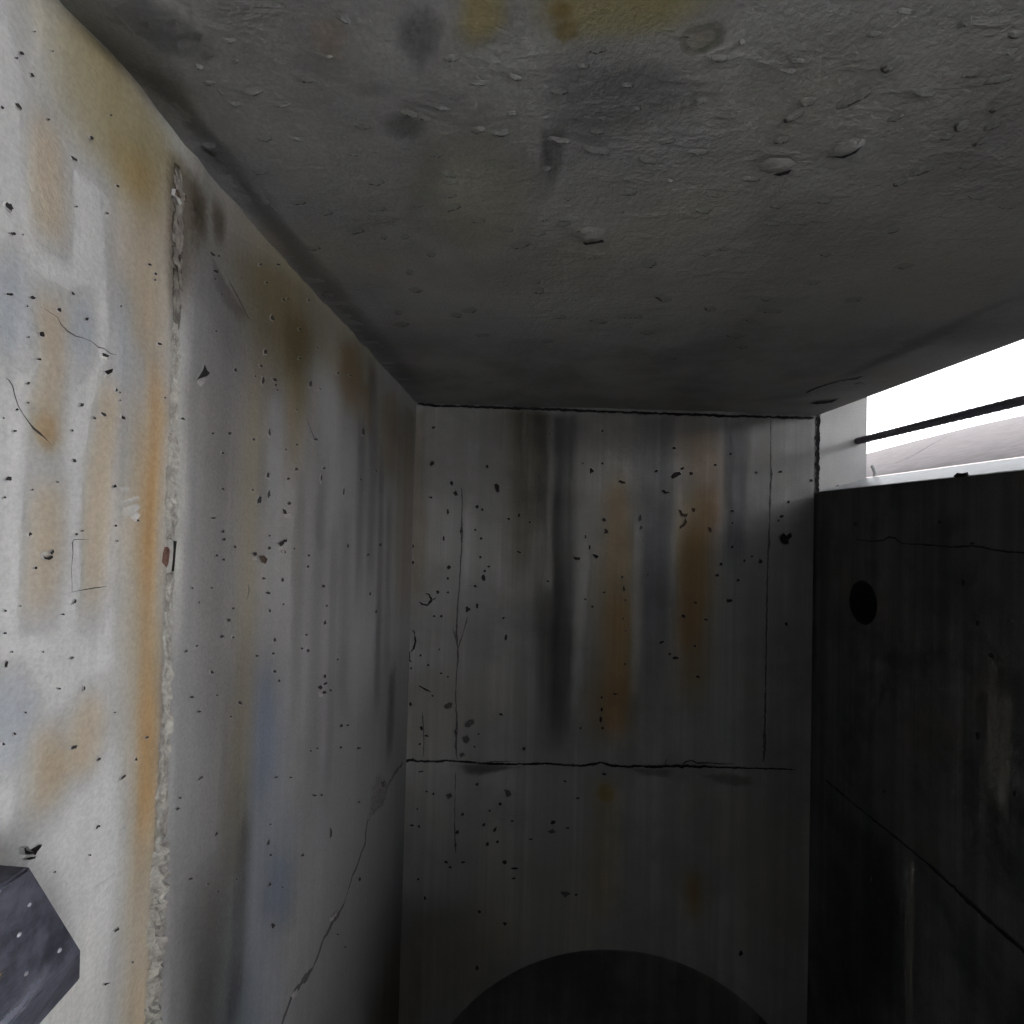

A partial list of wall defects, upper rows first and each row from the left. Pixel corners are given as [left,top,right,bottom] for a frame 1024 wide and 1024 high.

crack [42,307,116,355]
crack [6,378,50,443]
spalling [162,539,177,573]
crack [281,376,866,1024]
crack [825,779,1024,953]